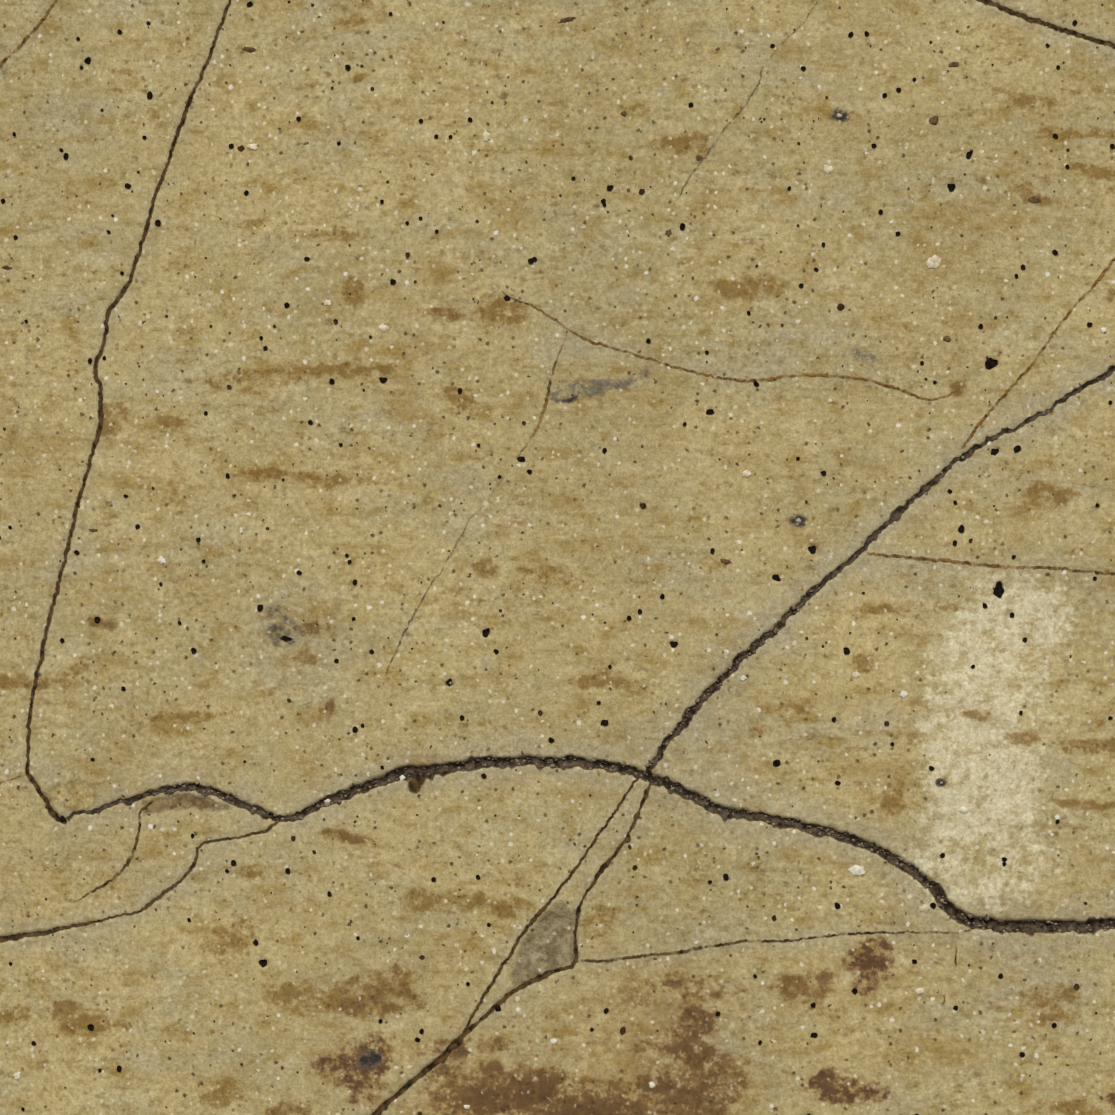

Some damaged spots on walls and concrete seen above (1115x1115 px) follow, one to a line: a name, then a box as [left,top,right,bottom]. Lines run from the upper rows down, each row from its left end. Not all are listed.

crack [0,0,57,67]
crack [978,0,1115,49]
crack [680,66,763,194]
crack [1041,257,1115,350]
crack [25,0,231,824]
crack [502,291,955,451]
crack [996,358,1036,403]
crack [0,365,1115,1115]